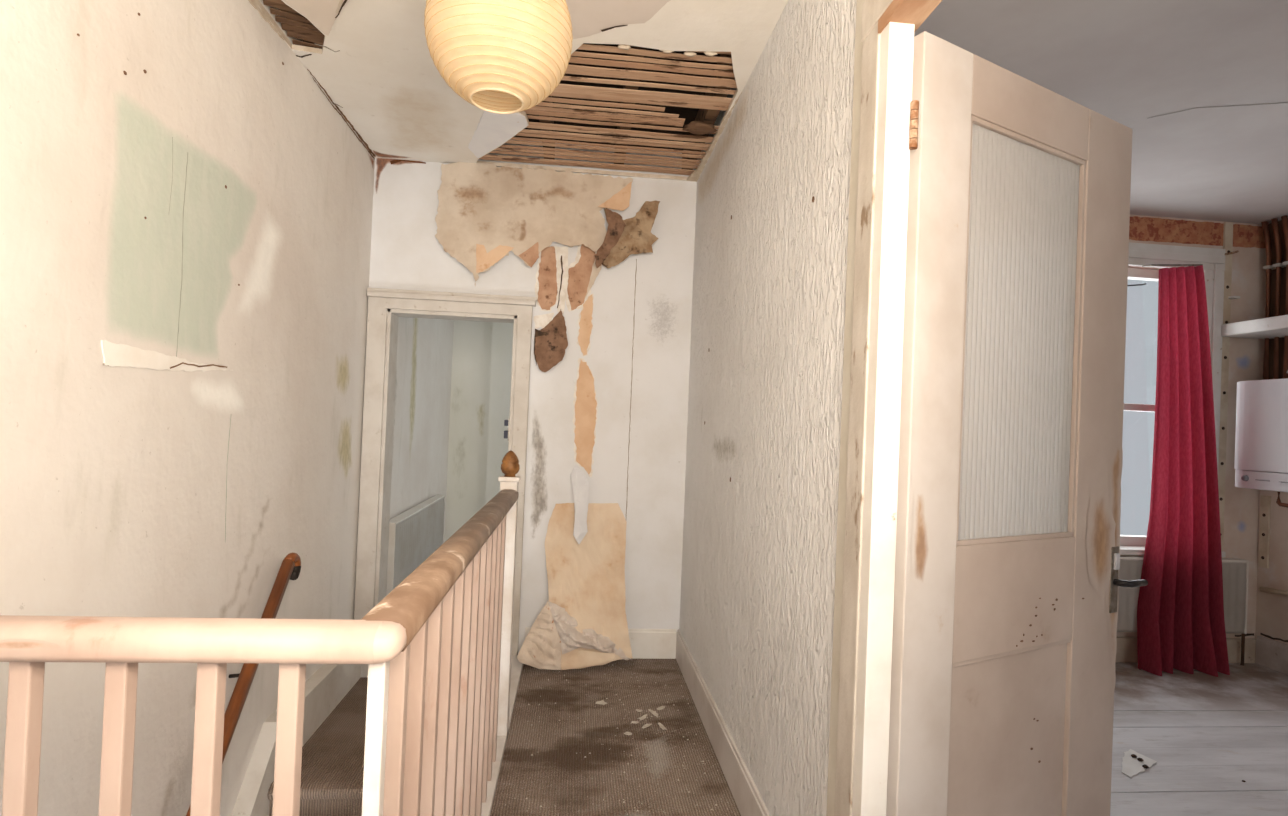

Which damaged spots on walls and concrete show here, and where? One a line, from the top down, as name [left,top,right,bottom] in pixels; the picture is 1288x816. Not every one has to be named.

flaking render [248,0,325,49]
flaking render [468,0,742,211]
peeling [101,340,228,372]
peeling [534,244,598,477]